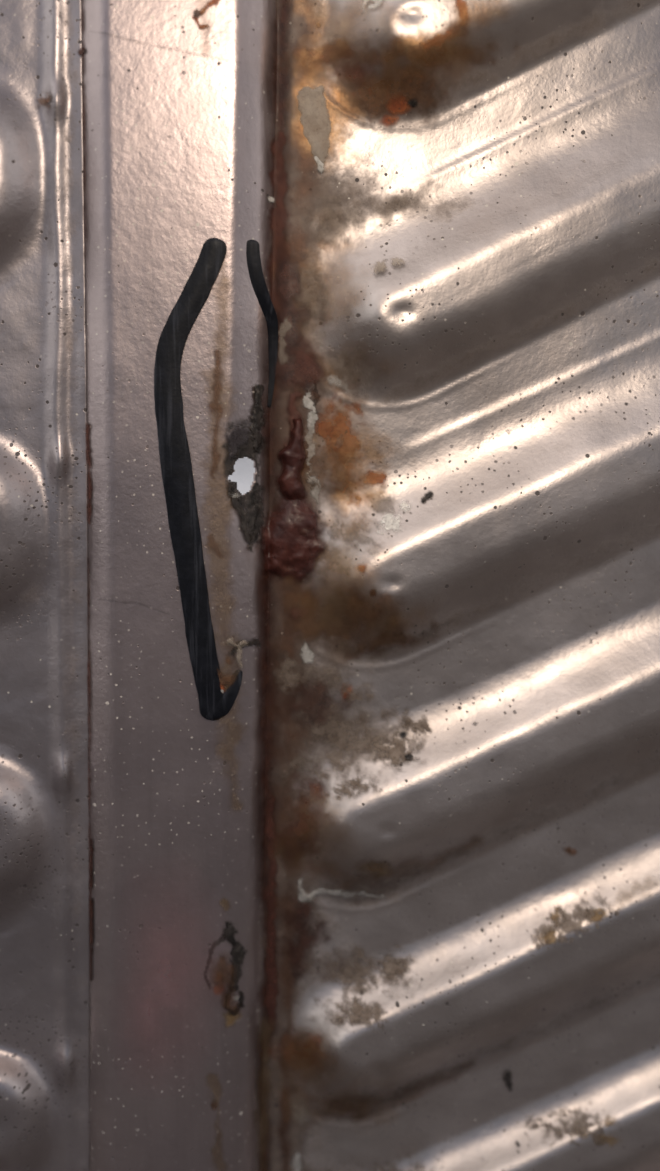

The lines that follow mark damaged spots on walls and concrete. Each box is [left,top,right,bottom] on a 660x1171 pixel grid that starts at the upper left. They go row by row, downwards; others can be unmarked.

rust [193,0,219,29]
rust [264,0,482,513]
rust [218,554,329,1171]